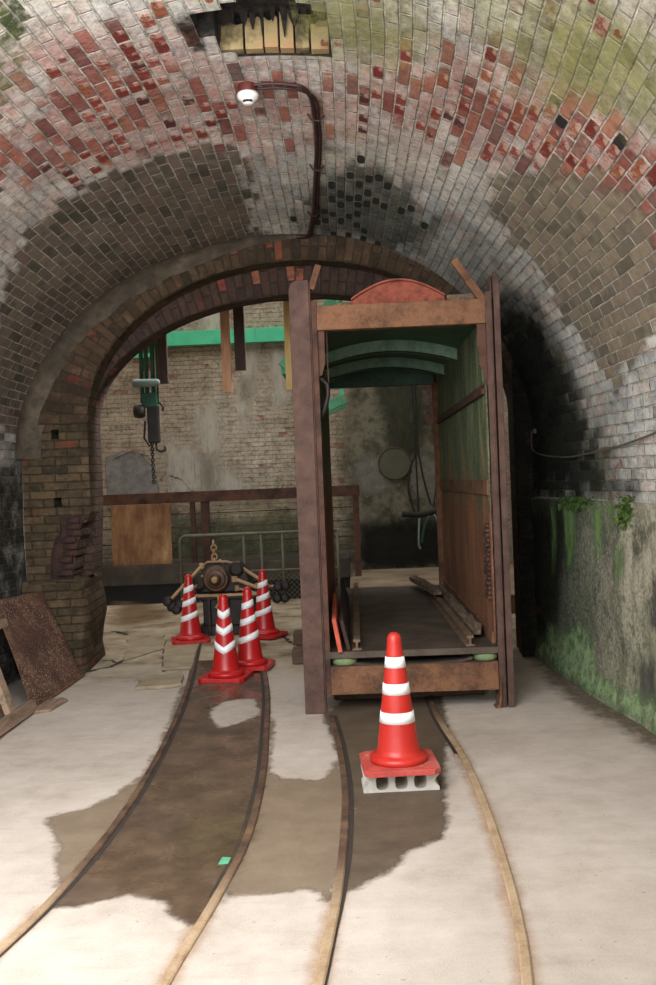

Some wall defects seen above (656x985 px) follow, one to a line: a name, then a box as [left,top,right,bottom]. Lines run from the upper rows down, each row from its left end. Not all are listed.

peeling [46,57,67,78]
peeling [96,1,170,106]
spalling [176,0,342,57]
damp [500,298,633,657]
crack [89,659,124,672]
damp [46,660,448,925]